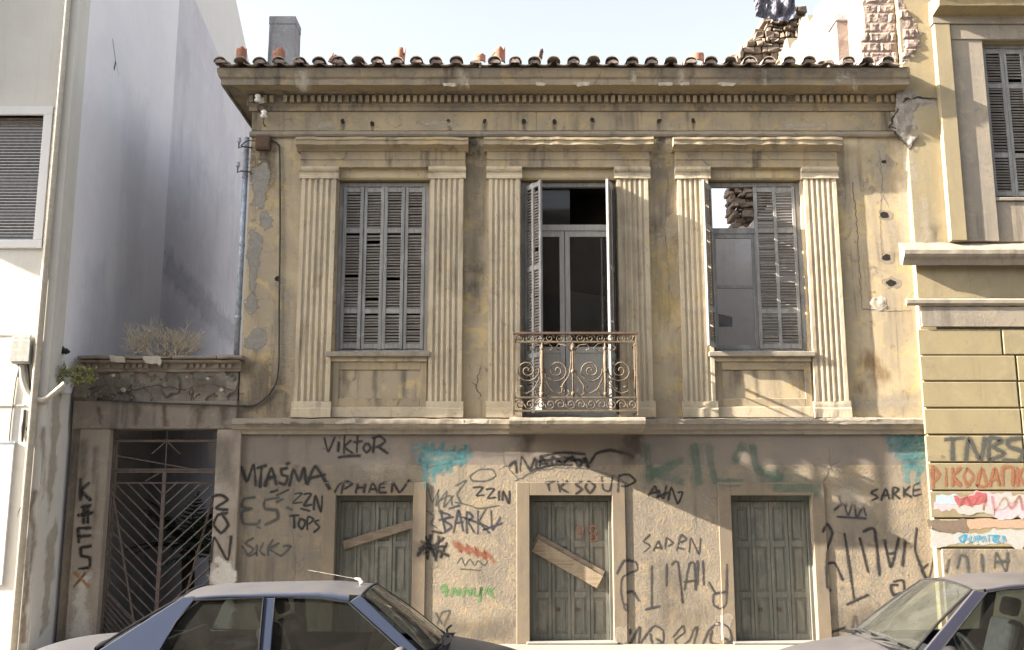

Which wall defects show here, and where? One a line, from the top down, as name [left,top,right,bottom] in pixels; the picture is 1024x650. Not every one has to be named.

spalling [889,89,938,148]
spalling [879,210,893,220]
crack [852,96,937,312]
peeling [243,160,273,352]
spalling [869,251,902,311]
crack [88,377,233,398]
peeling [210,555,237,585]